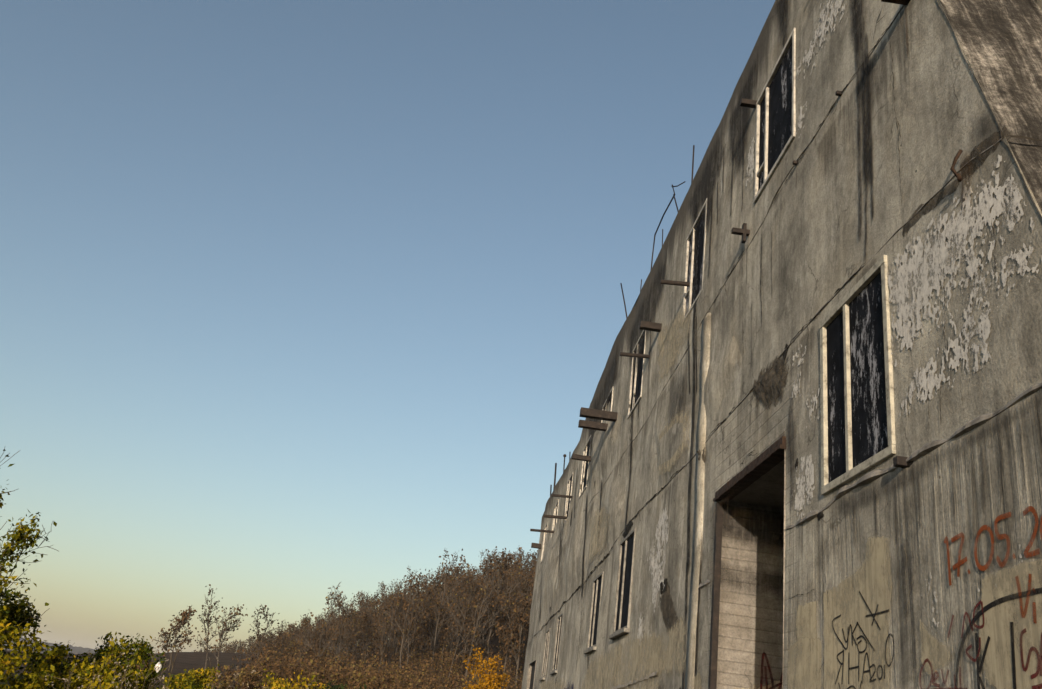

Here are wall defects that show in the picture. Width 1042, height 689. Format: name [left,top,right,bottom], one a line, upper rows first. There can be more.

peeling [796,0,847,79]
damp [851,0,874,259]
peeling [887,127,1042,416]
peeling [791,454,824,522]
peeling [637,504,679,645]